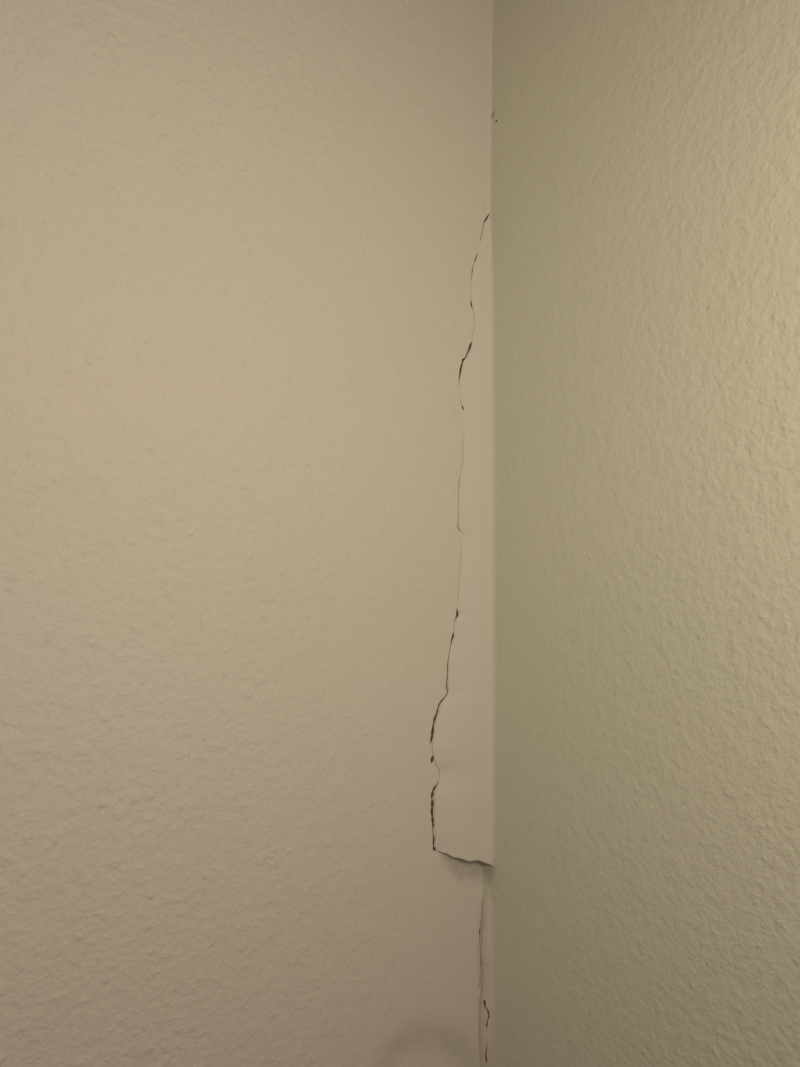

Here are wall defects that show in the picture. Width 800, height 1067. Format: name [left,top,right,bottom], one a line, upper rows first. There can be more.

crack [459,214,489,410]
crack [430,527,461,851]
crack [482,1000,490,1062]